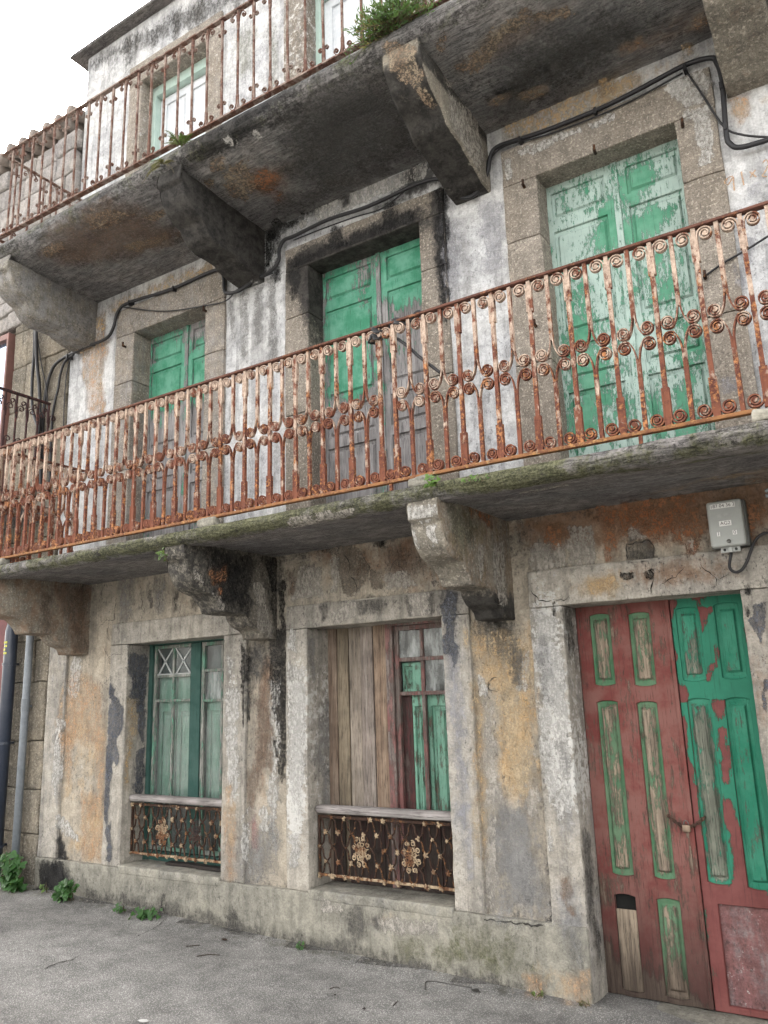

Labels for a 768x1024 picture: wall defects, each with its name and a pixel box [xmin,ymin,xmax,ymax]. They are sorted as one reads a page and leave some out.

leakage [228,66,418,359]
leakage [287,508,355,529]
leakage [128,652,148,794]
leakage [207,536,287,881]